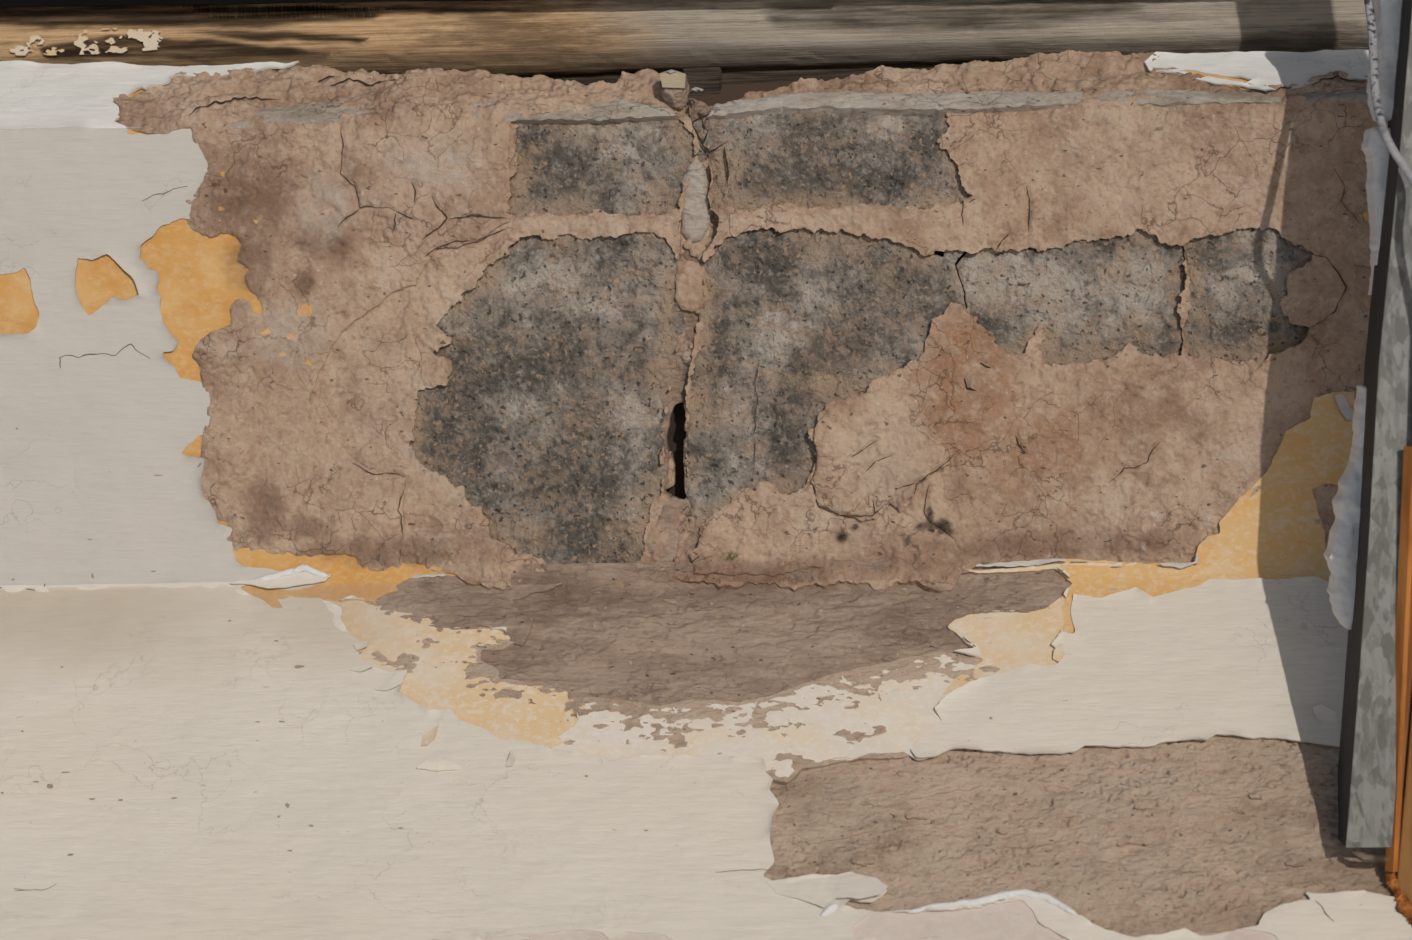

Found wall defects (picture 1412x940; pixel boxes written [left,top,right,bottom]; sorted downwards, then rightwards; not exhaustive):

peeling [10,28,163,56]
crack [188,97,279,117]
crack [318,75,400,86]
crack [687,102,729,187]
crack [340,132,505,256]
peeling [0,268,39,334]
peeling [75,254,138,315]
flaking render [113,50,1378,749]
flaking render [552,672,1395,940]